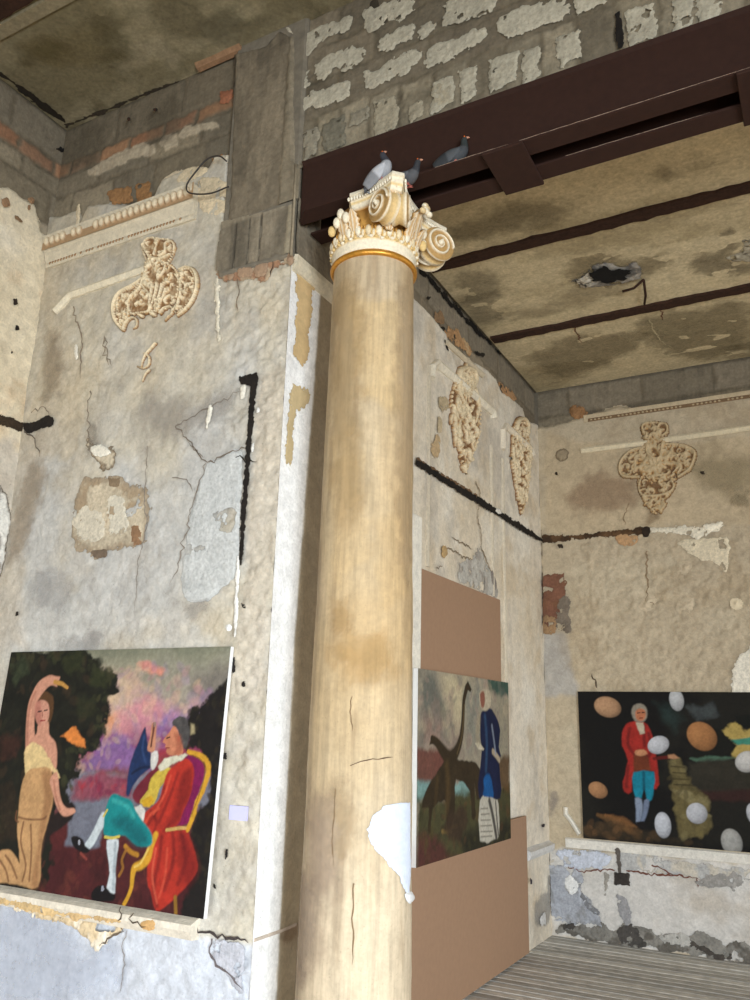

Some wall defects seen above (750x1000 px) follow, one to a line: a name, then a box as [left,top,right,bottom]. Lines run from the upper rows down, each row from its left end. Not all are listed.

peeling [214,253,315,367]
peeling [285,384,310,466]
spalling [71,438,152,560]
crack [134,446,148,609]
crack [171,391,244,581]
peeling [615,521,731,572]
flaking render [541,573,571,635]
crack [118,906,143,991]
crack [197,929,248,989]
peeling [367,802,415,904]
crack [568,865,699,886]
spalling [540,848,750,964]